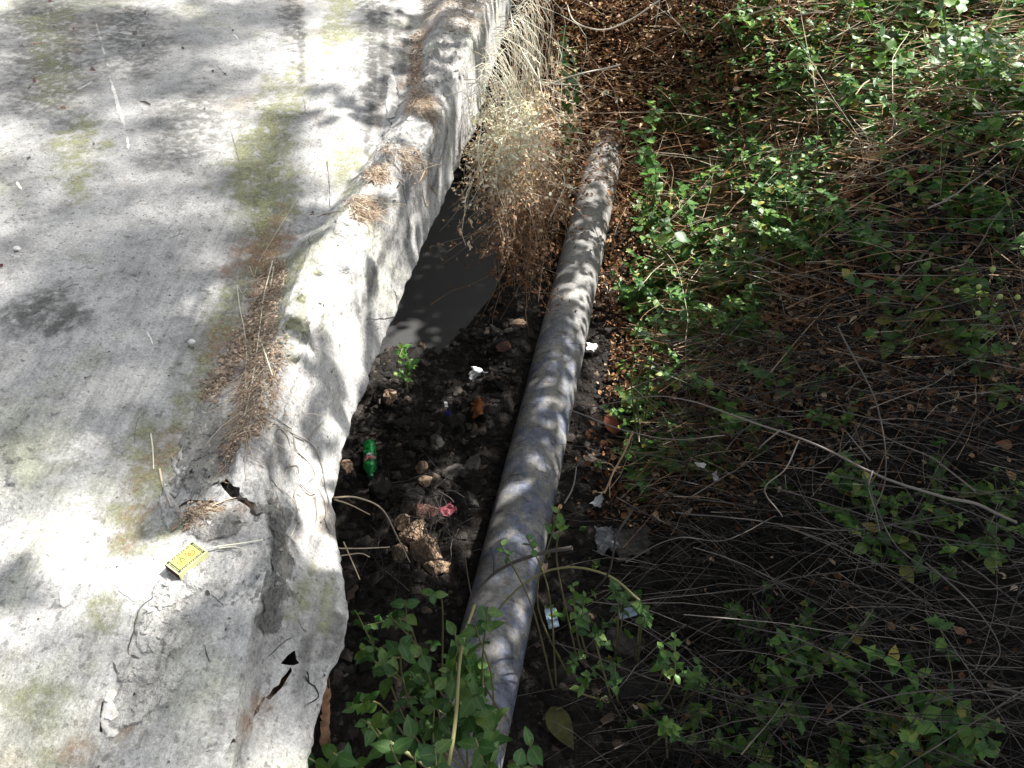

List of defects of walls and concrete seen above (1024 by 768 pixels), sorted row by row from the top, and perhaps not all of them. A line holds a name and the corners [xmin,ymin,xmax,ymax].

crack [179,478,262,516]
crack [208,621,319,751]